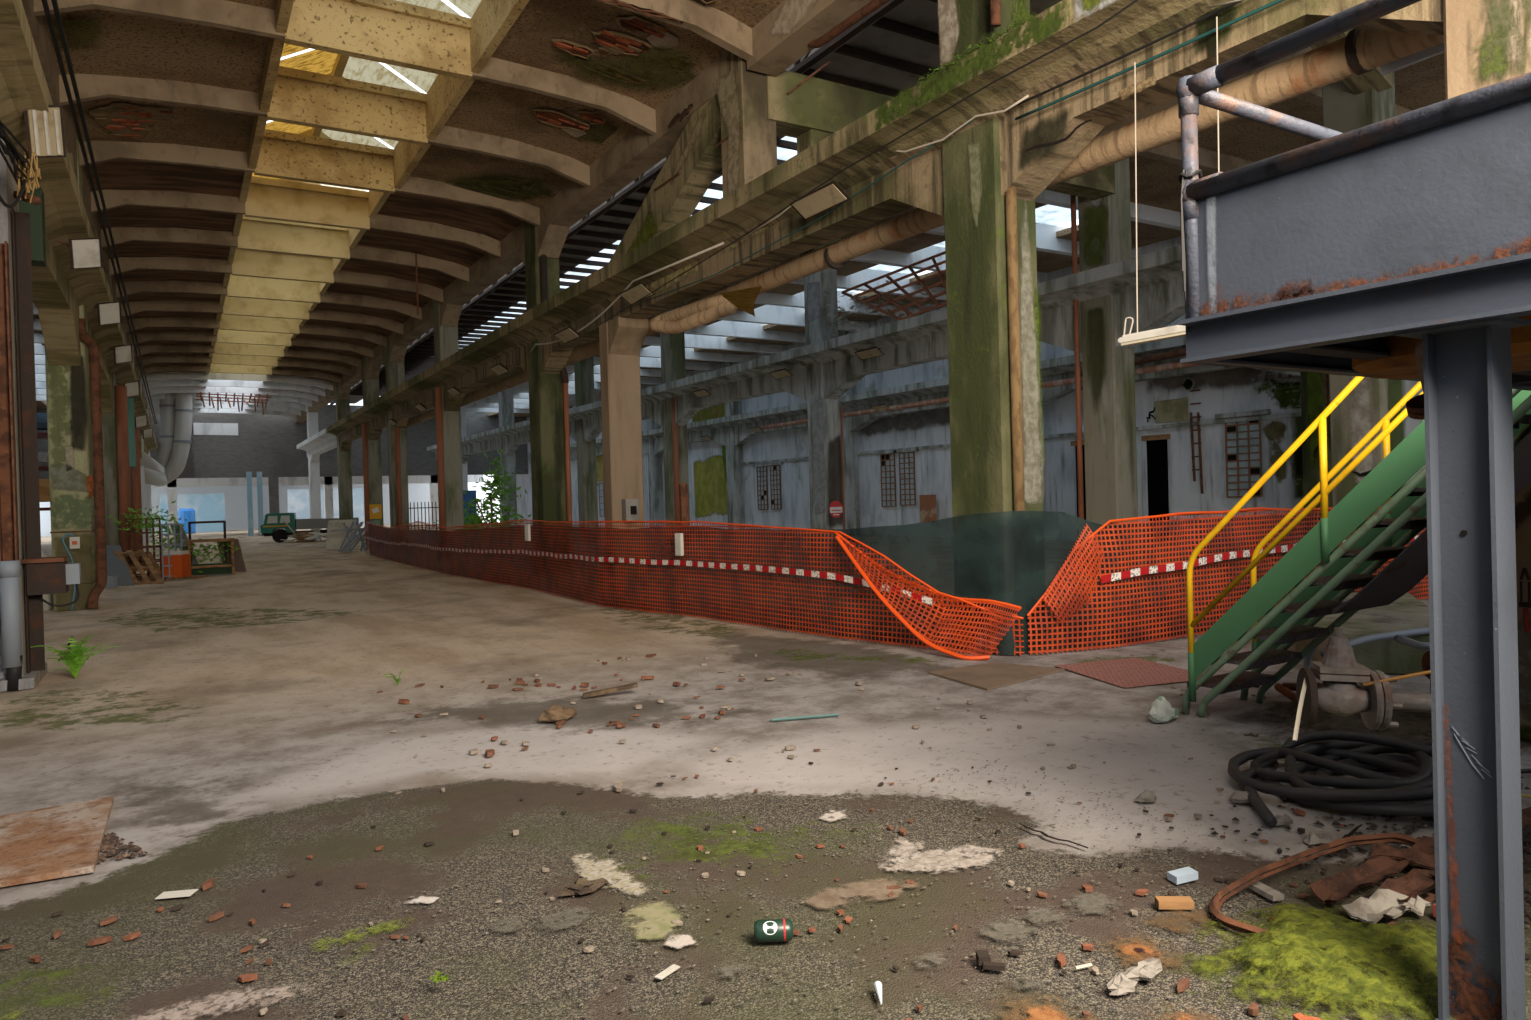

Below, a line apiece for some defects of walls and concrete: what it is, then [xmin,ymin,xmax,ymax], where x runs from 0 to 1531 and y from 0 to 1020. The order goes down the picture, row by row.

corrosion [1200,236,1531,316]
corrosion [1444,707,1502,1020]